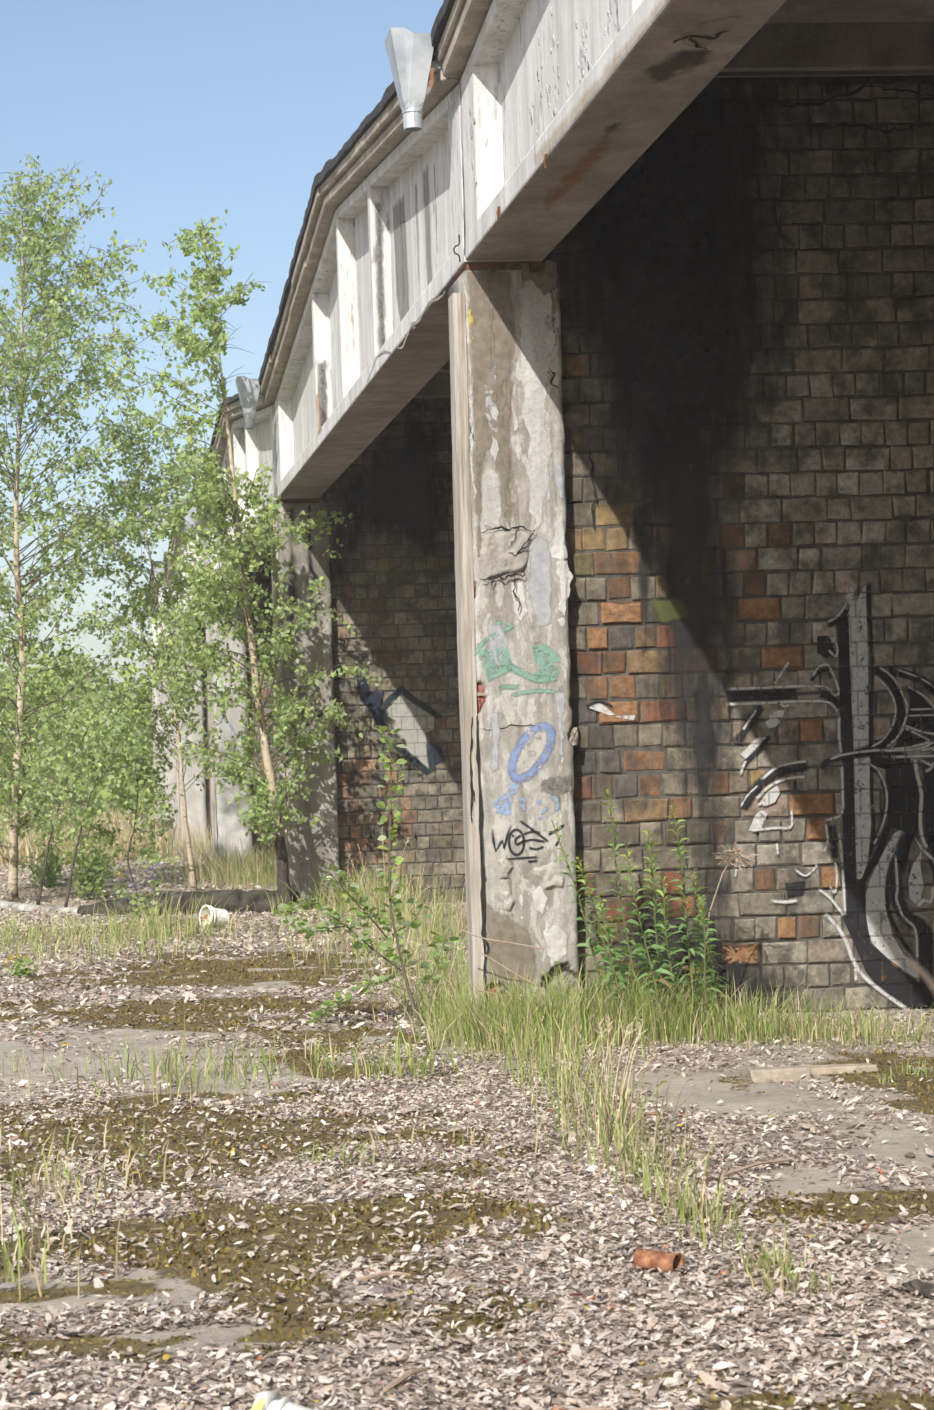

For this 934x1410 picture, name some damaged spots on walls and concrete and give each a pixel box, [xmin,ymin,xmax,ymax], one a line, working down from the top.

water stain [647,51,708,82]
crack [672,30,731,49]
peeling [472,282,573,627]
crack [480,526,535,611]
water stain [625,434,790,1012]